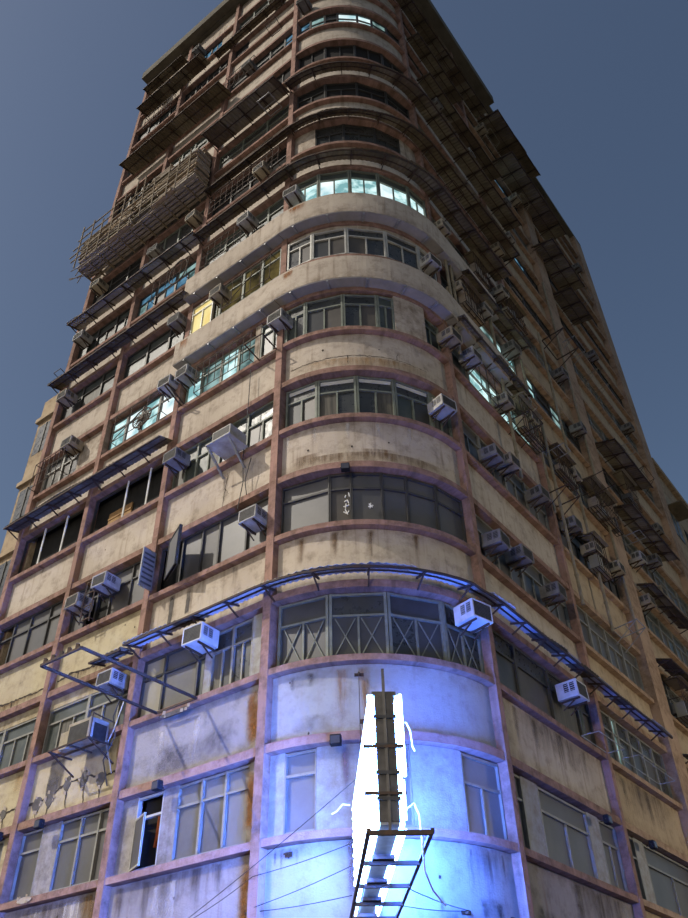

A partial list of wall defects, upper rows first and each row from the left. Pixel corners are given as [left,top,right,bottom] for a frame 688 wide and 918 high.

corrosion [249,698,257,734]
peeling [32,759,107,814]